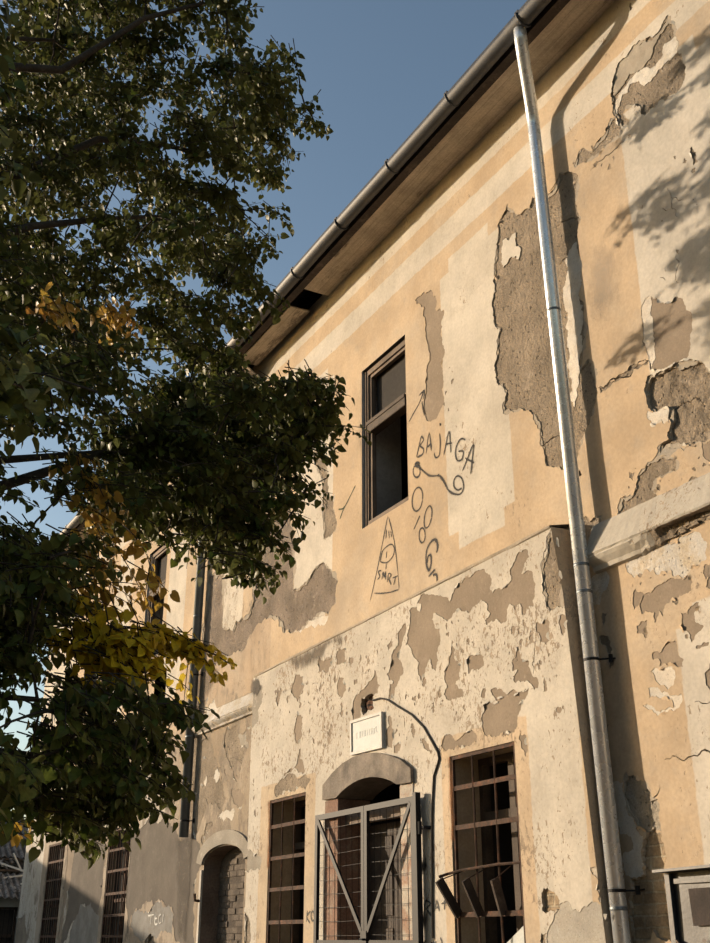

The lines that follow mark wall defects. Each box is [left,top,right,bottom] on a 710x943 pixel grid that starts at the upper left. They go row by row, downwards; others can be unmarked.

peeling [415,290,454,422]
flaking render [492,198,564,470]
flaking render [548,15,710,515]
flaking render [201,508,338,667]
peeling [266,533,568,798]
peeling [591,571,615,669]
peeling [625,511,710,716]
peeling [57,826,109,943]
peeling [126,685,264,943]
peeling [540,866,607,943]
flaking render [613,773,671,943]
crack [665,749,710,761]